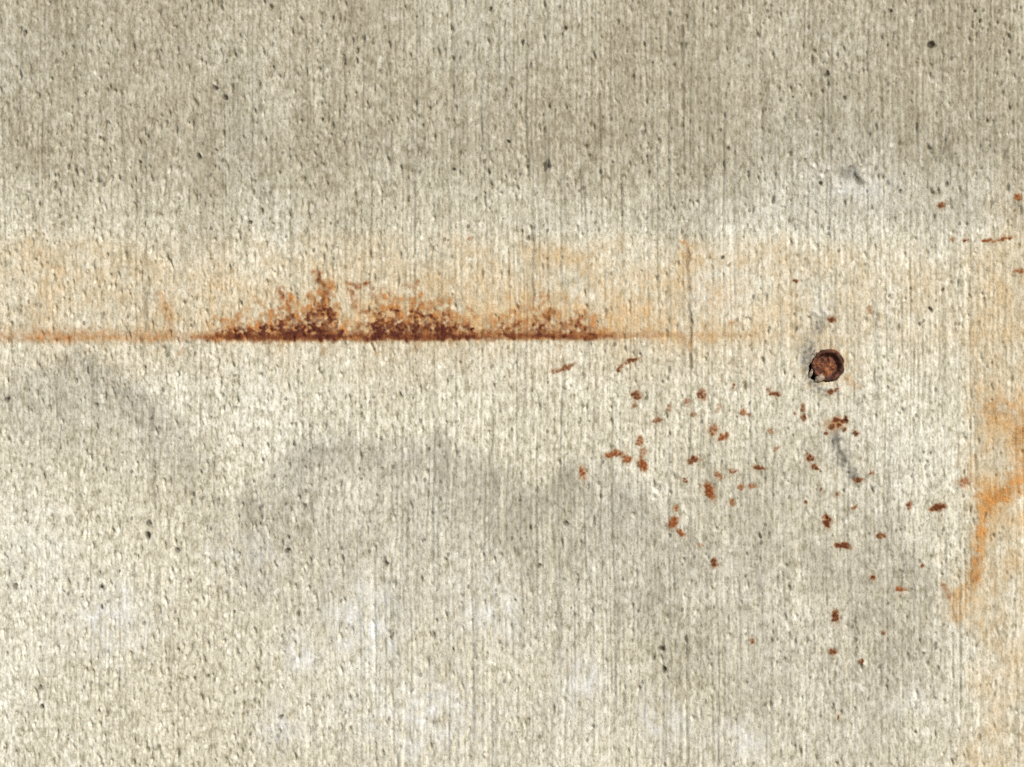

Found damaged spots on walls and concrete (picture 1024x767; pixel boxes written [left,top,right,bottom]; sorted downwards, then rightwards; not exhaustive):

corrosion [26,331,169,341]
corrosion [191,271,683,343]
corrosion [960,398,1024,582]